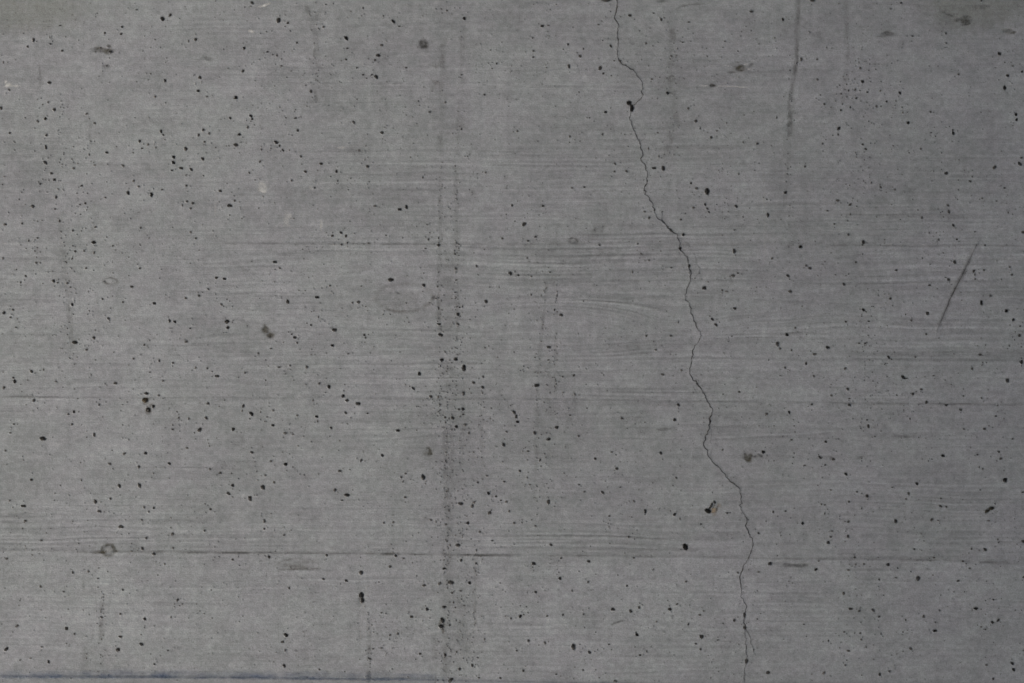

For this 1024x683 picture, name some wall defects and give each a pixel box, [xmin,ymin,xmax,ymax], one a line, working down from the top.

crack [614,1,754,682]